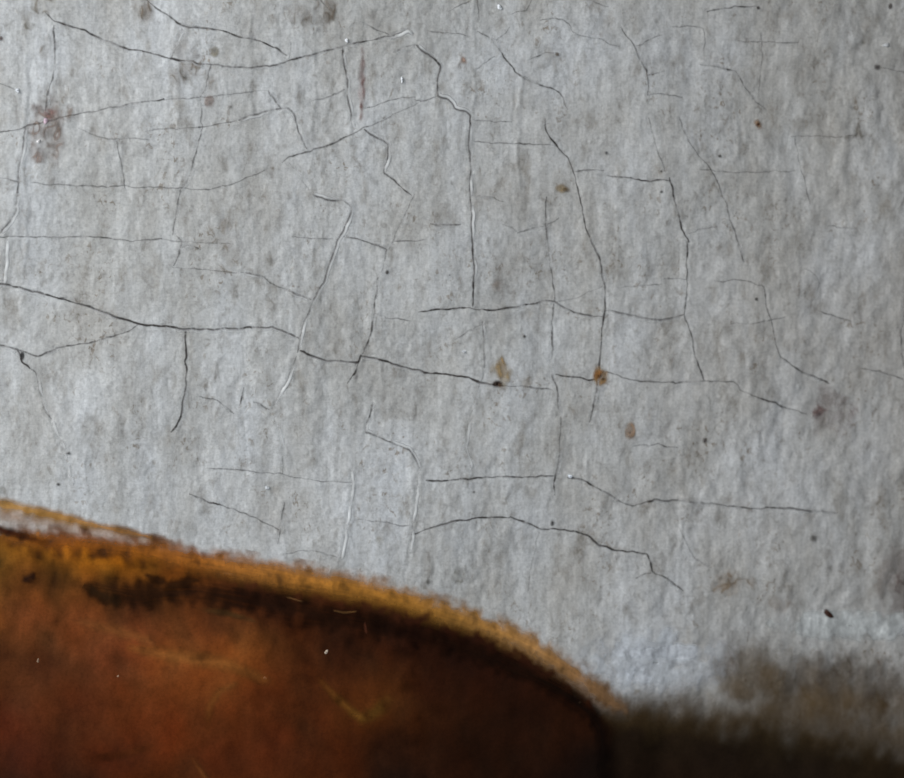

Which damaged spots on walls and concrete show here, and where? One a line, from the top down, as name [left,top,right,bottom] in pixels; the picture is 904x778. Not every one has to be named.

crack [0,6,733,448]
crack [342,473,355,558]
crack [365,404,833,590]